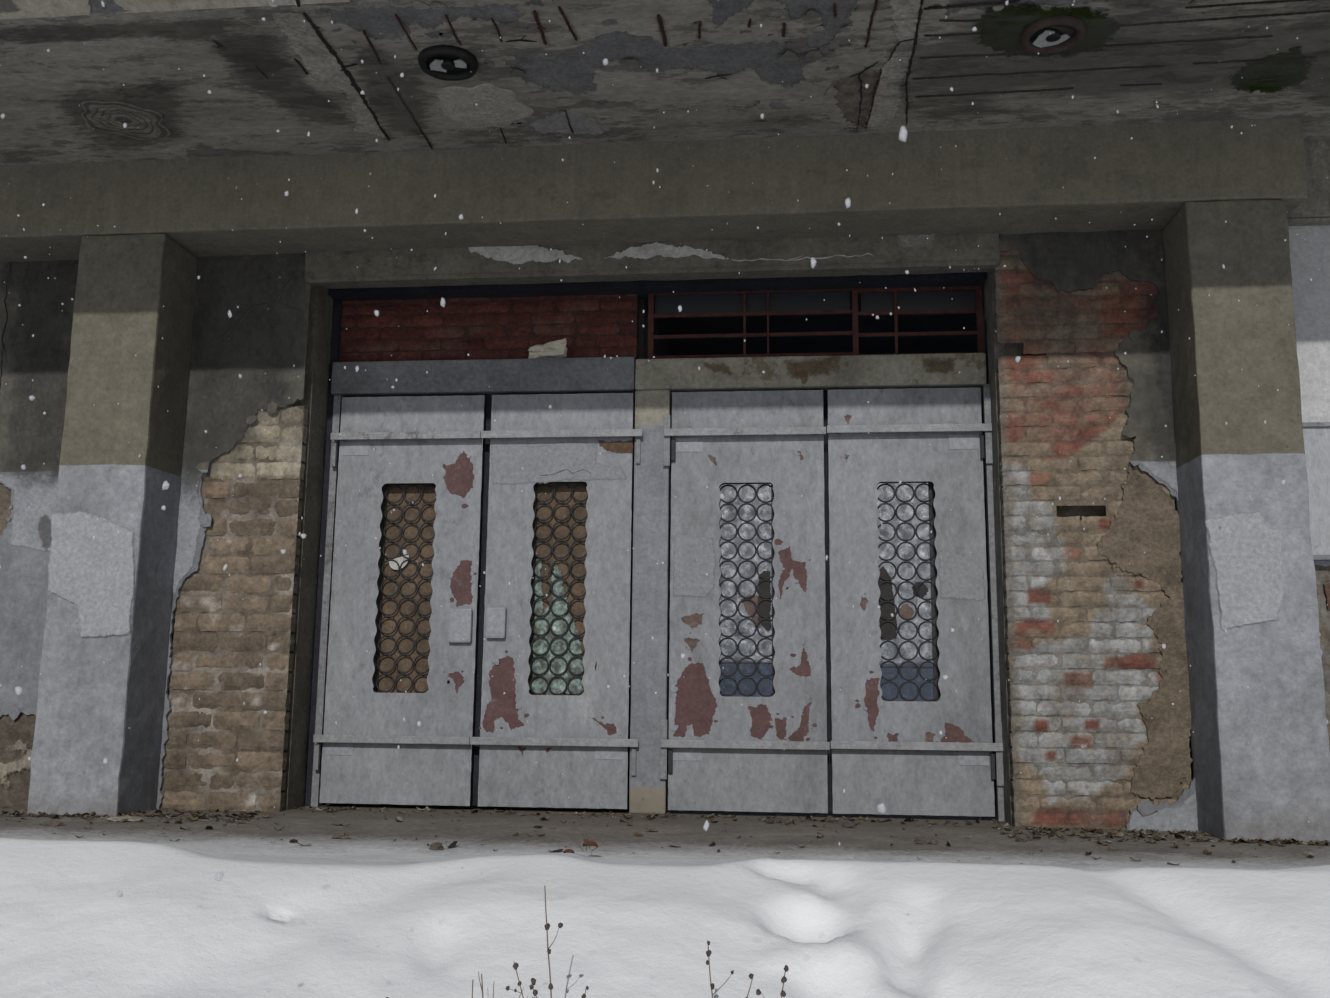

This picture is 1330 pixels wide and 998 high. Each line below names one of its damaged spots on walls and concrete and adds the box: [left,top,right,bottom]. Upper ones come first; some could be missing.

peeling [317,0,890,149]
peeling [930,0,1109,15]
peeling [468,245,582,264]
peeling [605,242,729,260]
flaking render [161,401,308,812]
flaking render [993,249,1193,830]
flaking render [1314,565,1330,748]
flaking render [0,705,36,807]